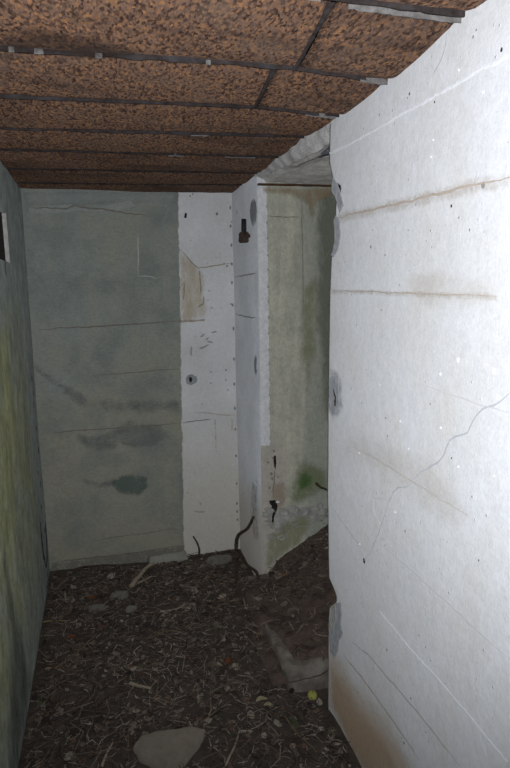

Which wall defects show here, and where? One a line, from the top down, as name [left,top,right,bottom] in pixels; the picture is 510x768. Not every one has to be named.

leakage [113,475,146,494]
crack [332,385,510,659]